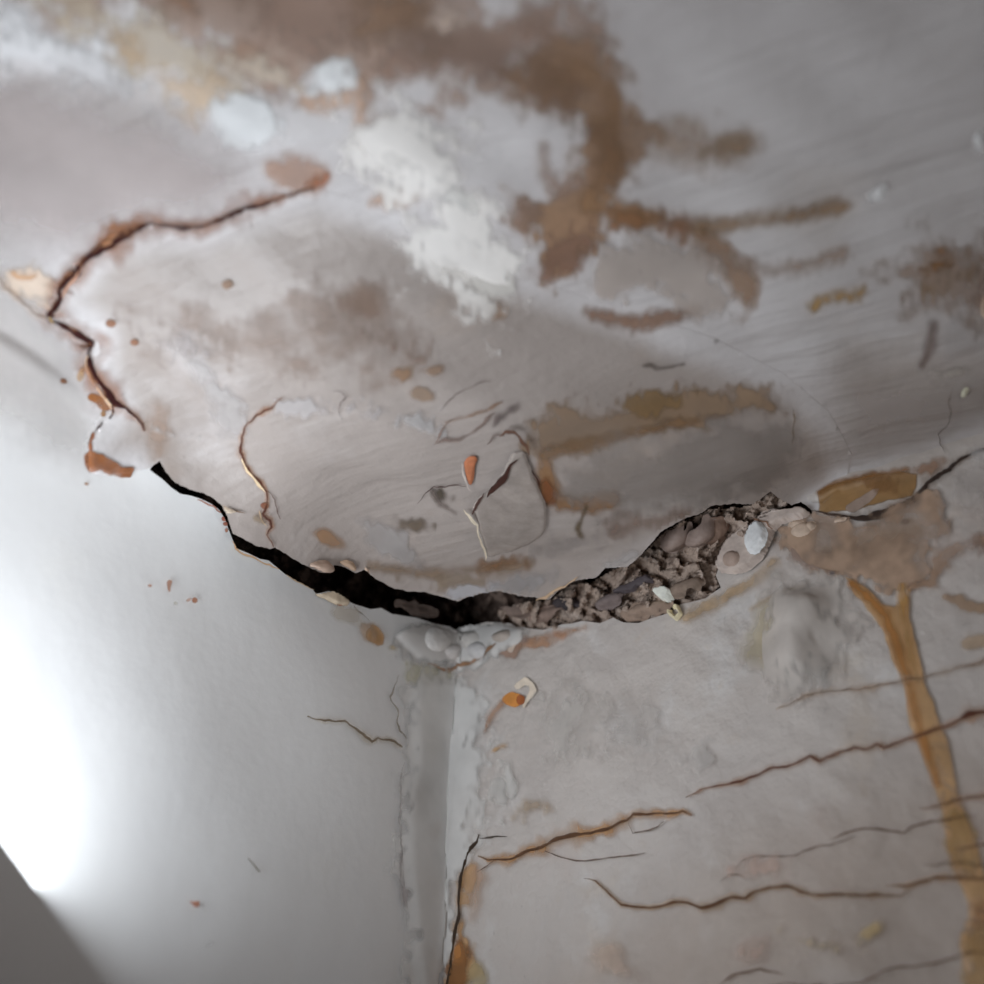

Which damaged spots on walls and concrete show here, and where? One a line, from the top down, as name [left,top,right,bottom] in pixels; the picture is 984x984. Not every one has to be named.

leakage [0,100,211,224]
leakage [130,0,757,305]
leakage [769,203,847,222]
crack [20,187,315,433]
leakage [587,310,693,330]
crack [239,398,282,547]
spalling [150,461,950,630]
corrosion [818,461,938,513]
crack [816,432,984,521]
crack [307,675,407,747]
crack [446,710,984,984]
corrosion [847,578,984,984]